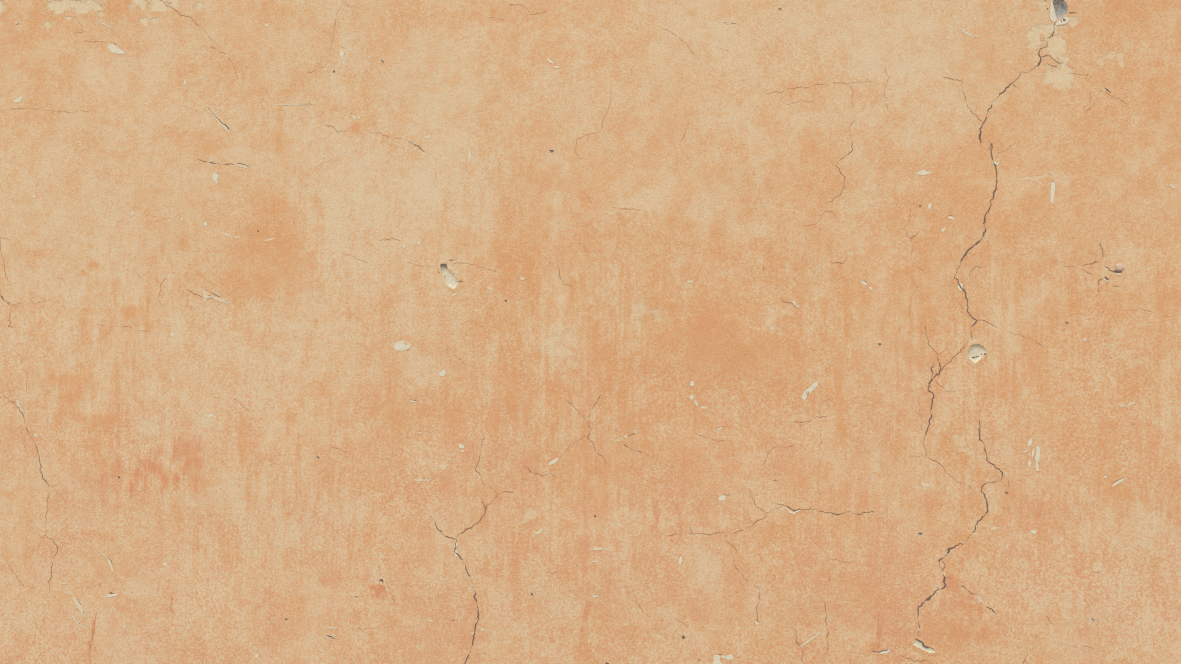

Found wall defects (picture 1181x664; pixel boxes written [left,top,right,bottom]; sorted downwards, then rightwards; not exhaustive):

crack [768,82,856,226]
peeling [1019,0,1088,96]
crack [0,238,58,588]
spalling [437,258,462,297]
crack [403,397,606,664]
crack [669,397,880,625]
crack [873,22,1127,664]